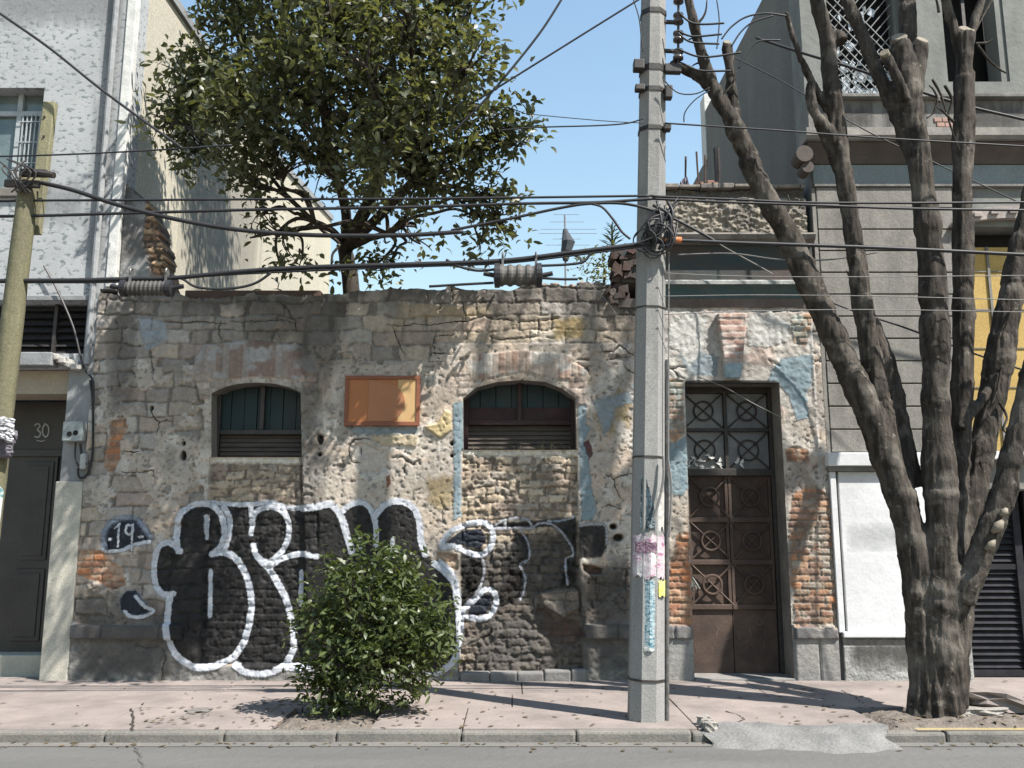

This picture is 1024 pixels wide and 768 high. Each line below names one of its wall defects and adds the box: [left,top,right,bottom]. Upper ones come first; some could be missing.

crack [388,299,560,362]
peeling [747,311,814,420]
spalling [104,419,128,473]
crack [121,409,172,485]
flaking render [785,446,809,463]
spalling [77,550,125,590]
flaking render [669,532,693,627]
flaking render [788,483,838,629]